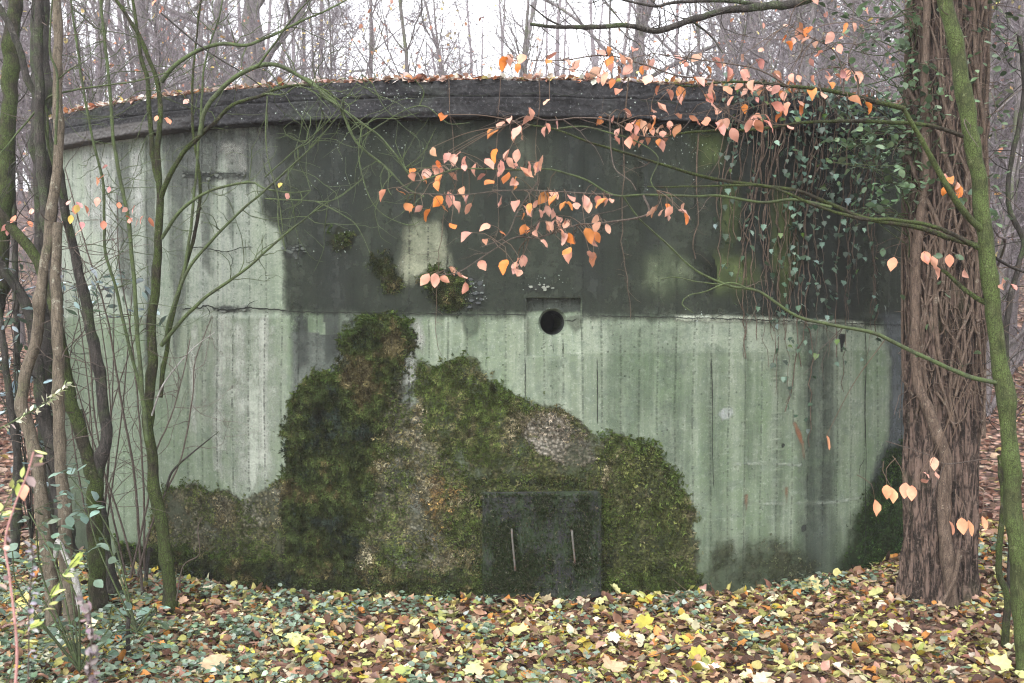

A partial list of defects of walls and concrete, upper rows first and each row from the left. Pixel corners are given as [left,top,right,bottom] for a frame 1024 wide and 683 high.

crack [183,301,523,320]
leakage [83,120,904,572]